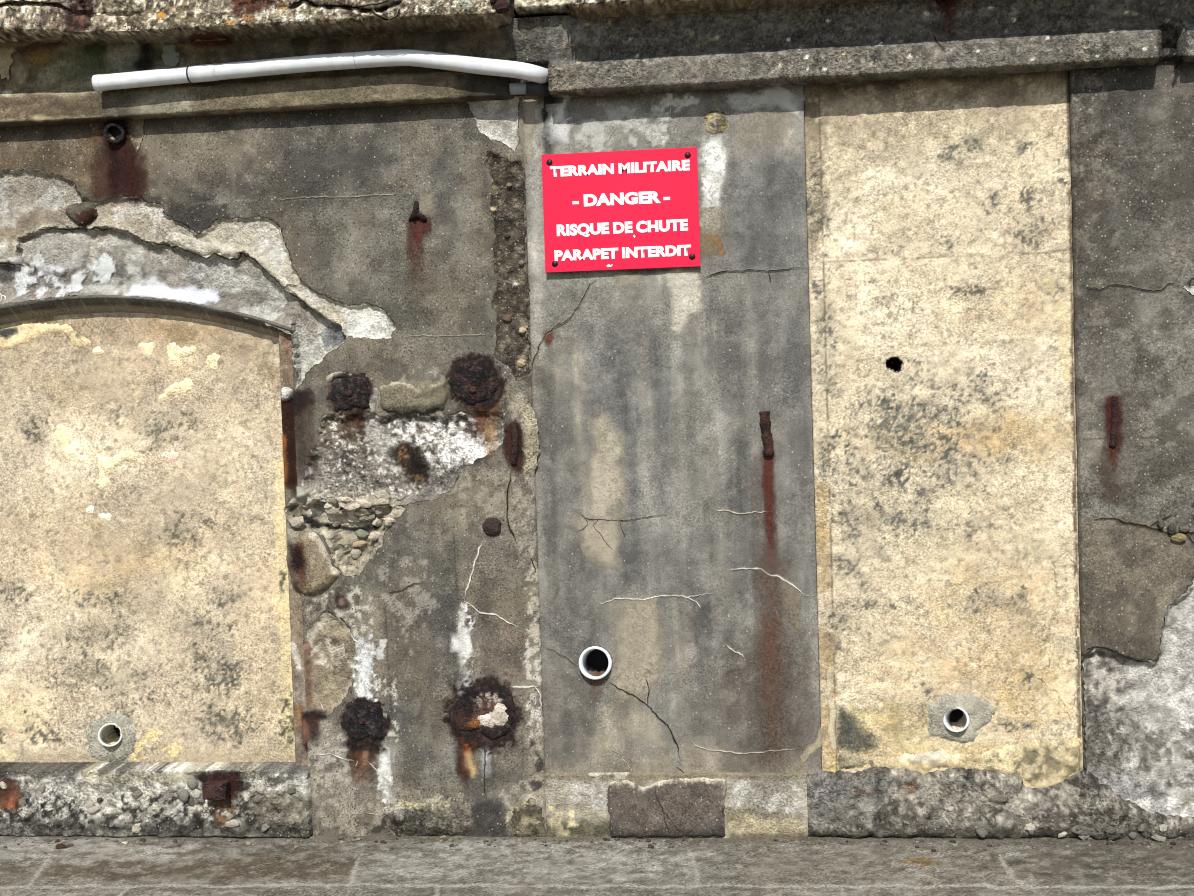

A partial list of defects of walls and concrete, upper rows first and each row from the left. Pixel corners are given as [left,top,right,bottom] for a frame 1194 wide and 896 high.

spalling [0,169,396,390]
corrosion [282,372,374,491]
spalling [284,411,506,579]
corrosion [393,441,431,484]
corrosion [445,352,525,472]
spalling [519,403,540,475]
crack [464,541,516,626]
crack [602,593,711,608]
crack [730,567,808,596]
corrosion [753,411,791,762]
crack [611,678,792,776]
spalling [838,550,1194,817]